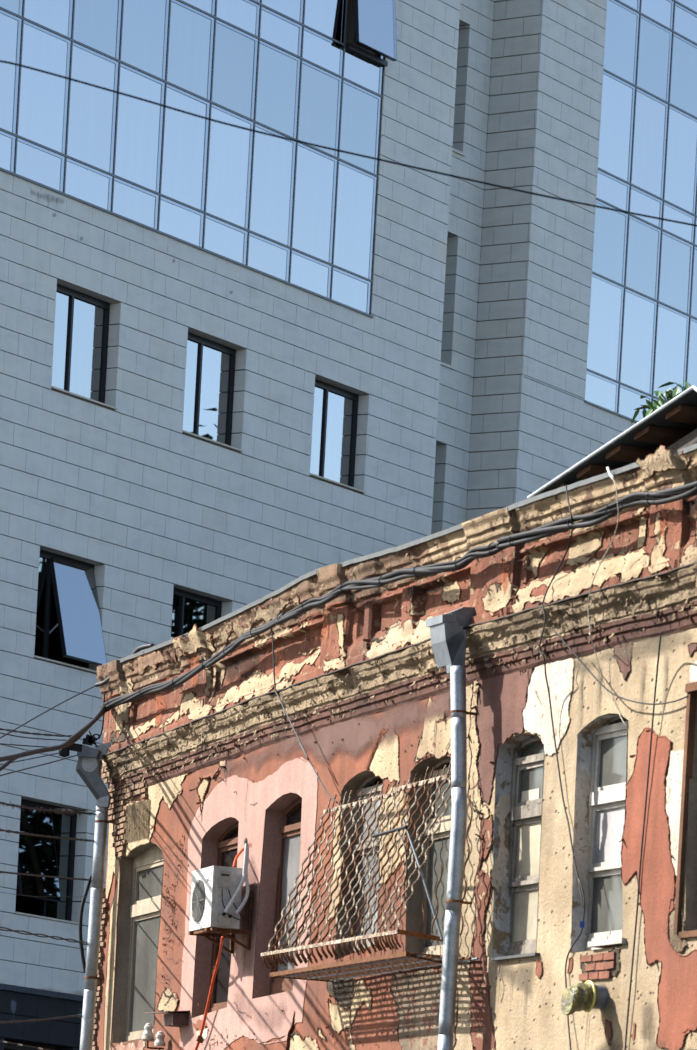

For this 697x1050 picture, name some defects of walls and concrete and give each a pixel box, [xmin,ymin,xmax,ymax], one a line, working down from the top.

peeling [92,445,697,1050]